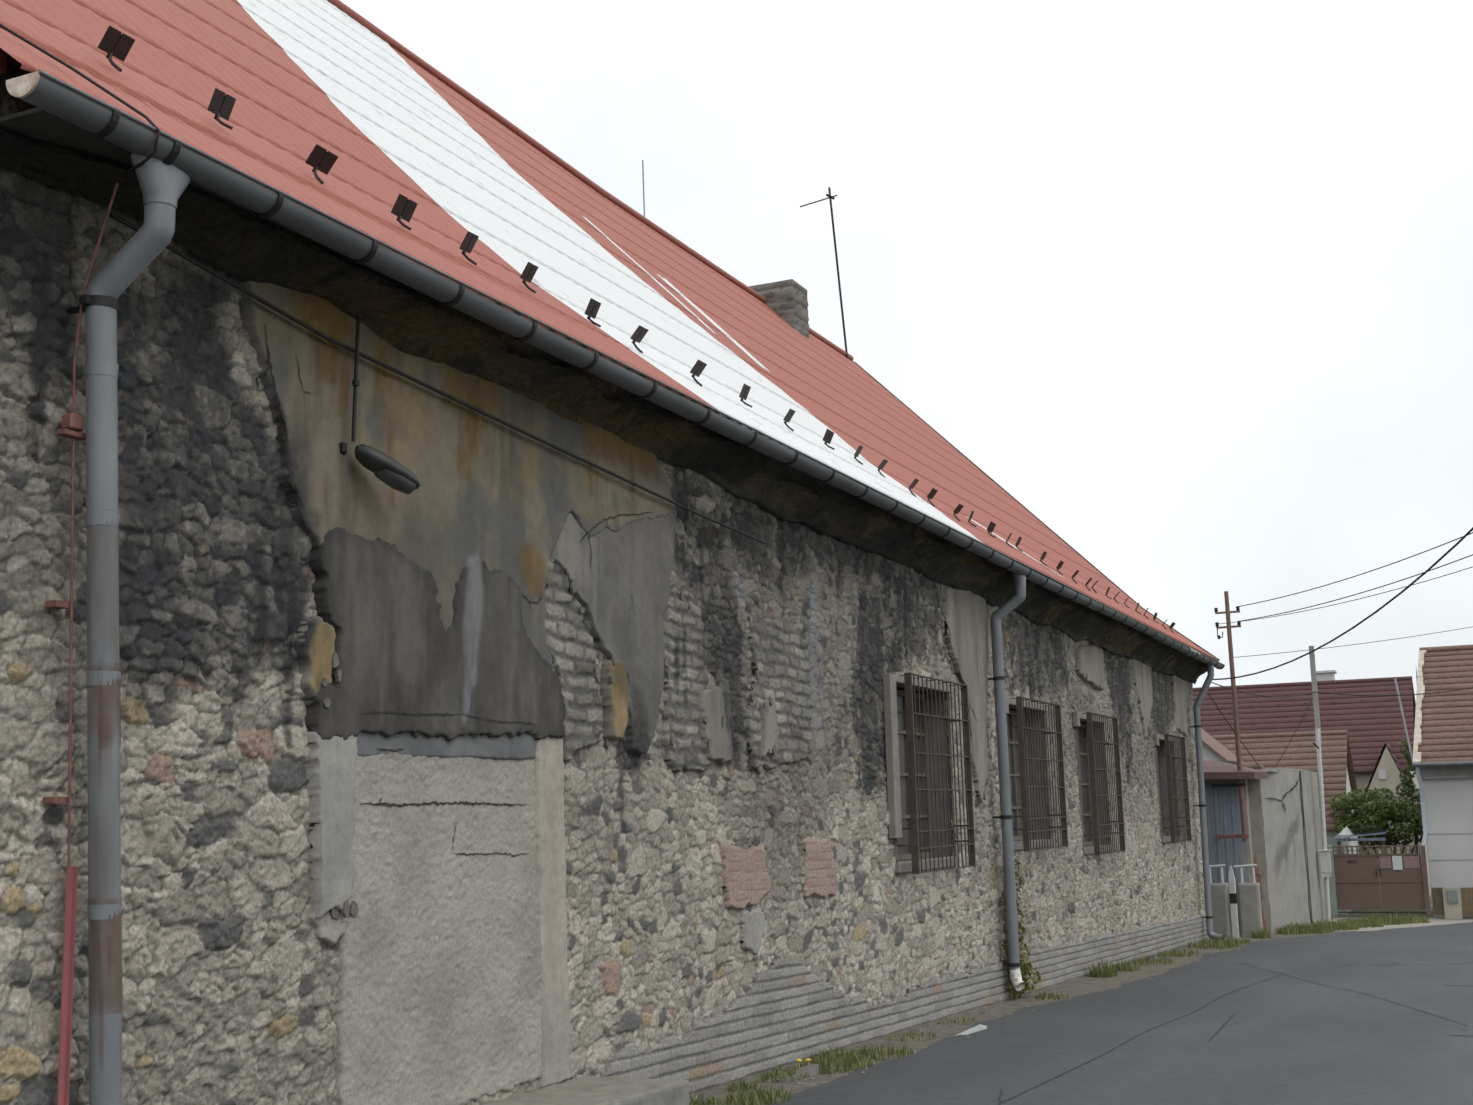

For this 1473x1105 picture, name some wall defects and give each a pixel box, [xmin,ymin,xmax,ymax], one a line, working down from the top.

water stain [117,273,316,744]
peeling [294,615,342,708]
spalling [543,559,631,762]
crack [522,512,654,649]
water stain [674,470,940,787]
water stain [1000,606,1068,695]
water stain [1104,649,1132,780]